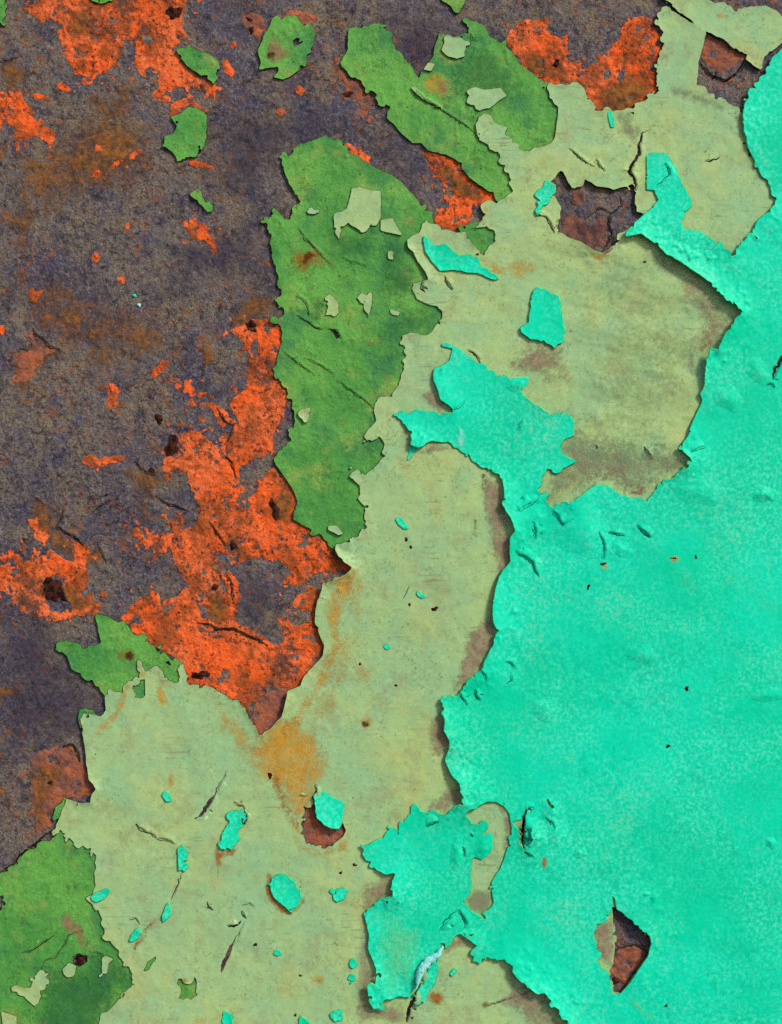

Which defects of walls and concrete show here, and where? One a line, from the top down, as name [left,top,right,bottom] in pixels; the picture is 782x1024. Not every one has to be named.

rust [165,6,182,20]
rust [600,54,647,111]
peeling [0,0,692,622]
rust [164,434,179,456]
rust [221,523,244,559]
rust [268,479,295,521]
peeling [232,0,782,1024]
rust [191,671,210,680]
rust [318,576,359,689]
rust [18,739,95,840]
peeling [0,545,368,1024]
rust [224,687,347,850]